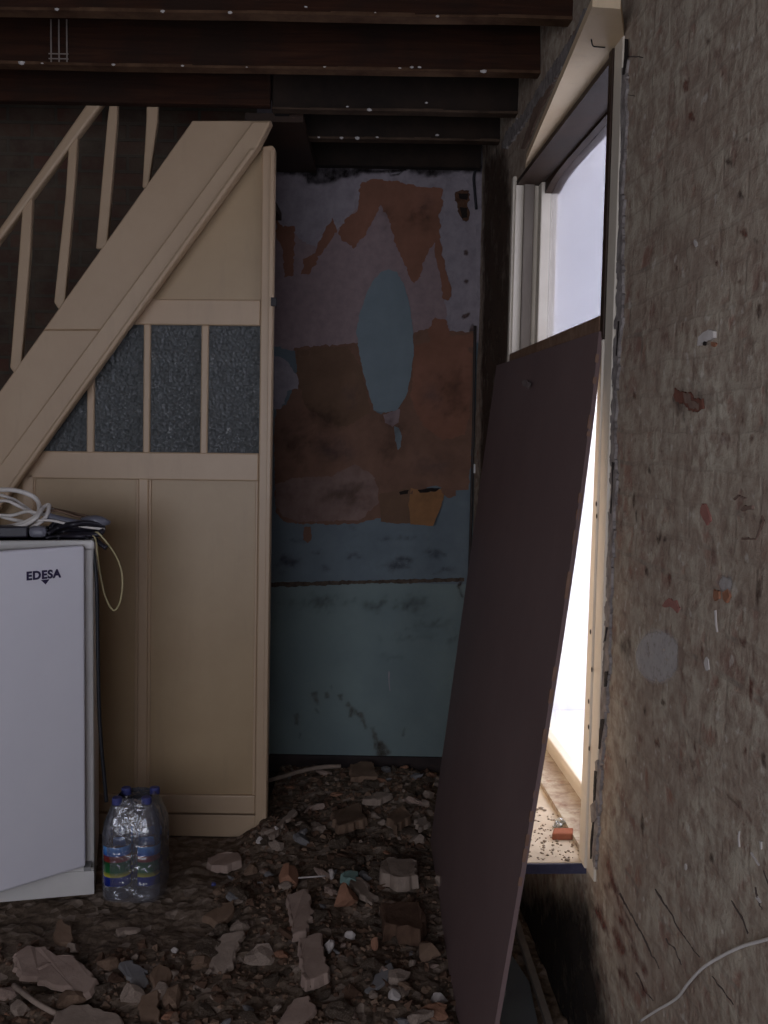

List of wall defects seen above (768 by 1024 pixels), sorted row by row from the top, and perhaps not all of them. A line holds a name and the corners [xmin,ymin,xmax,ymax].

flaking render [276,170,366,246]
flaking render [441,177,479,331]
flaking render [273,356,299,409]
peeling [356,269,414,450]
spalling [673,388,705,412]